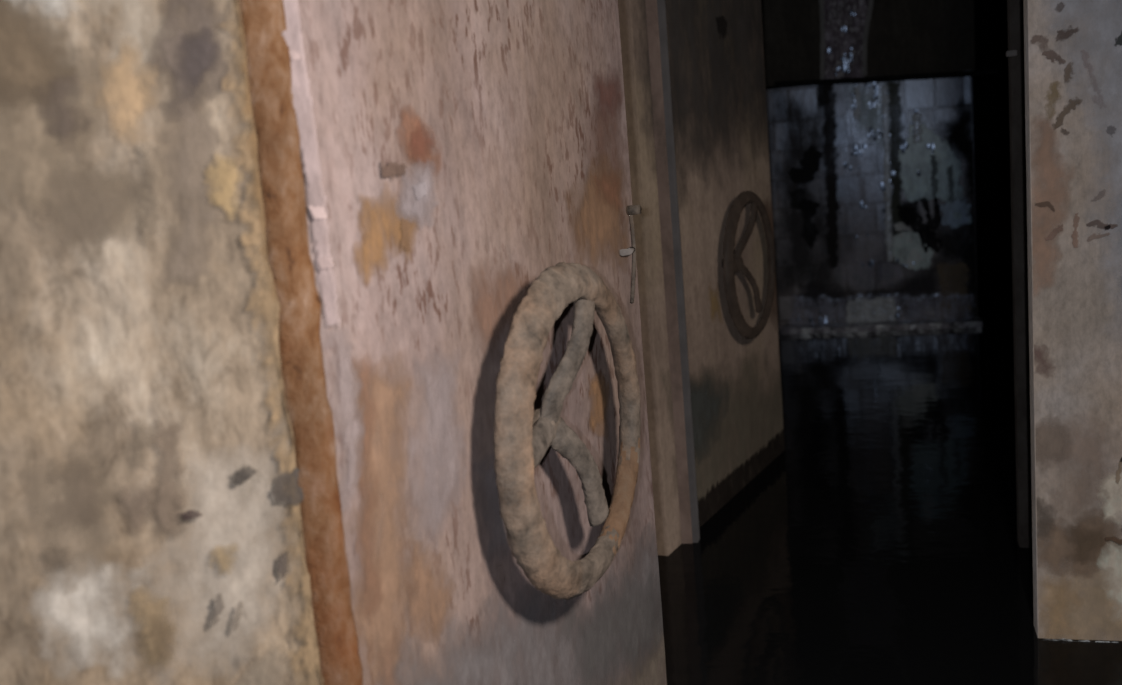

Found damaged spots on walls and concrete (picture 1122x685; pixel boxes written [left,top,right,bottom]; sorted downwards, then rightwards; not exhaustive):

water stain [784,0,977,324]
crack [1114,458,1122,484]